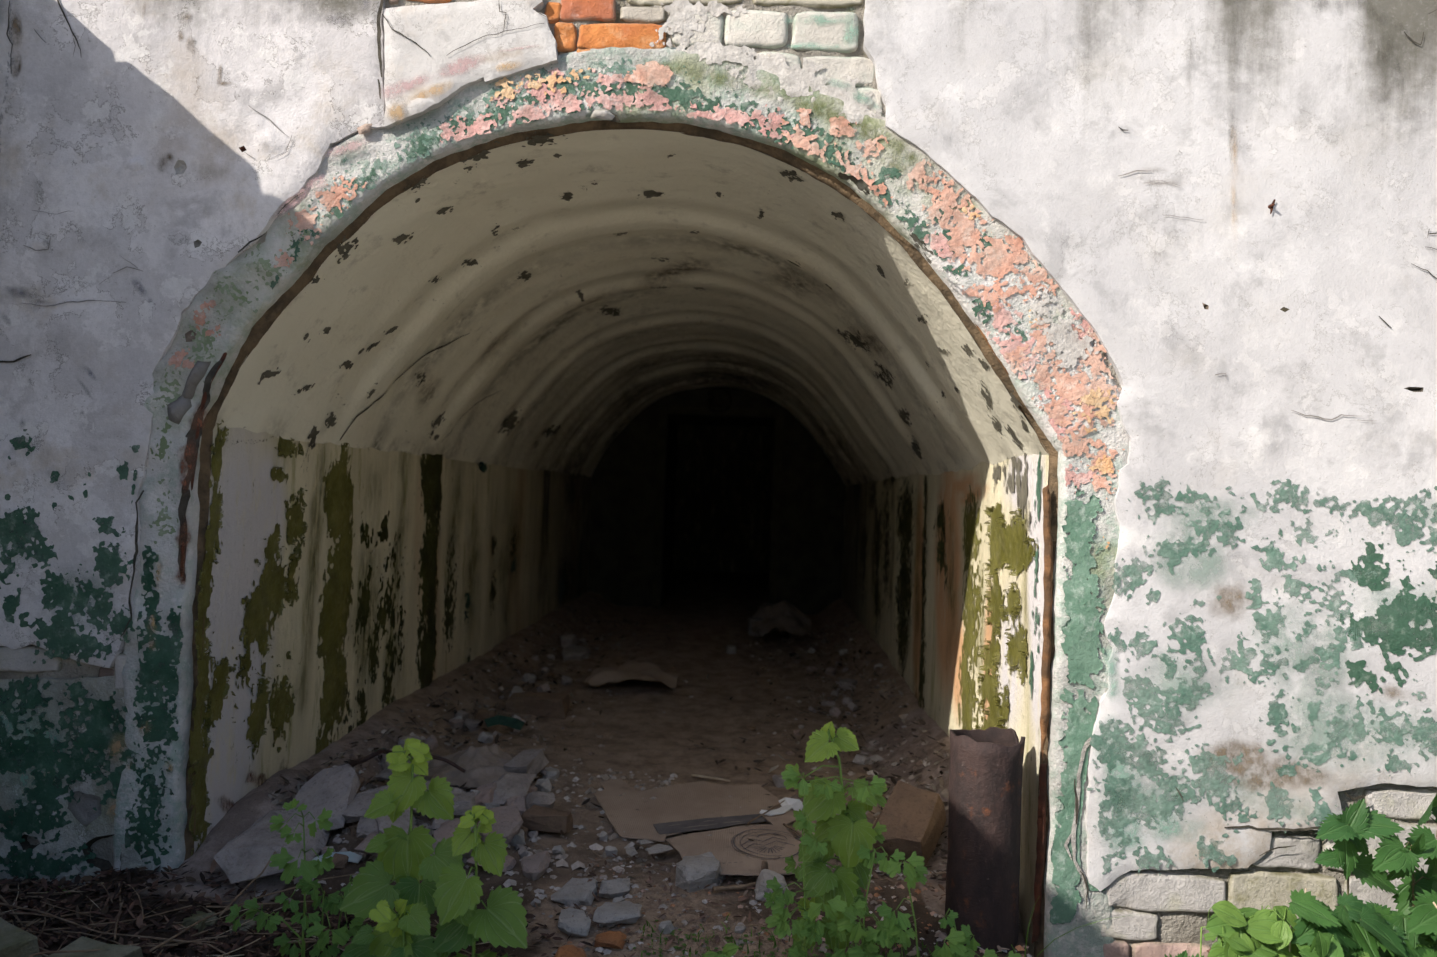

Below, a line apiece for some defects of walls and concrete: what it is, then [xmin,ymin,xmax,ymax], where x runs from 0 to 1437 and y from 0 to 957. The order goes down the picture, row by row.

crack [377,0,546,99]
spalling [174,160,187,175]
corrosion [176,525,191,583]
peeling [0,300,473,880]
peeling [274,58,1437,957]